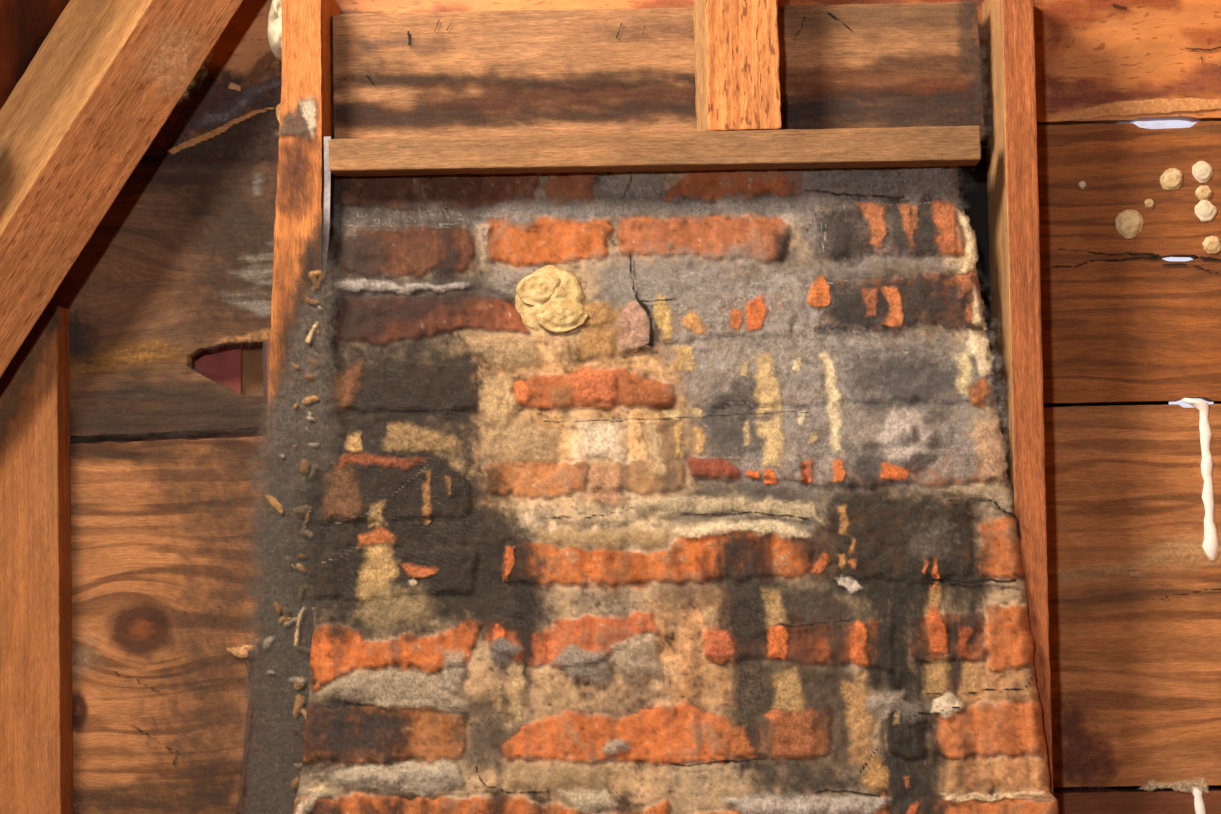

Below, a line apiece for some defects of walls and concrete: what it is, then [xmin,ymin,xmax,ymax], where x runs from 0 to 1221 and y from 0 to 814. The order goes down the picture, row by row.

damp [1045,0,1175,51]
damp [1045,65,1221,112]
crack [1047,249,1221,273]
crack [622,254,676,358]
damp [1140,778,1208,792]